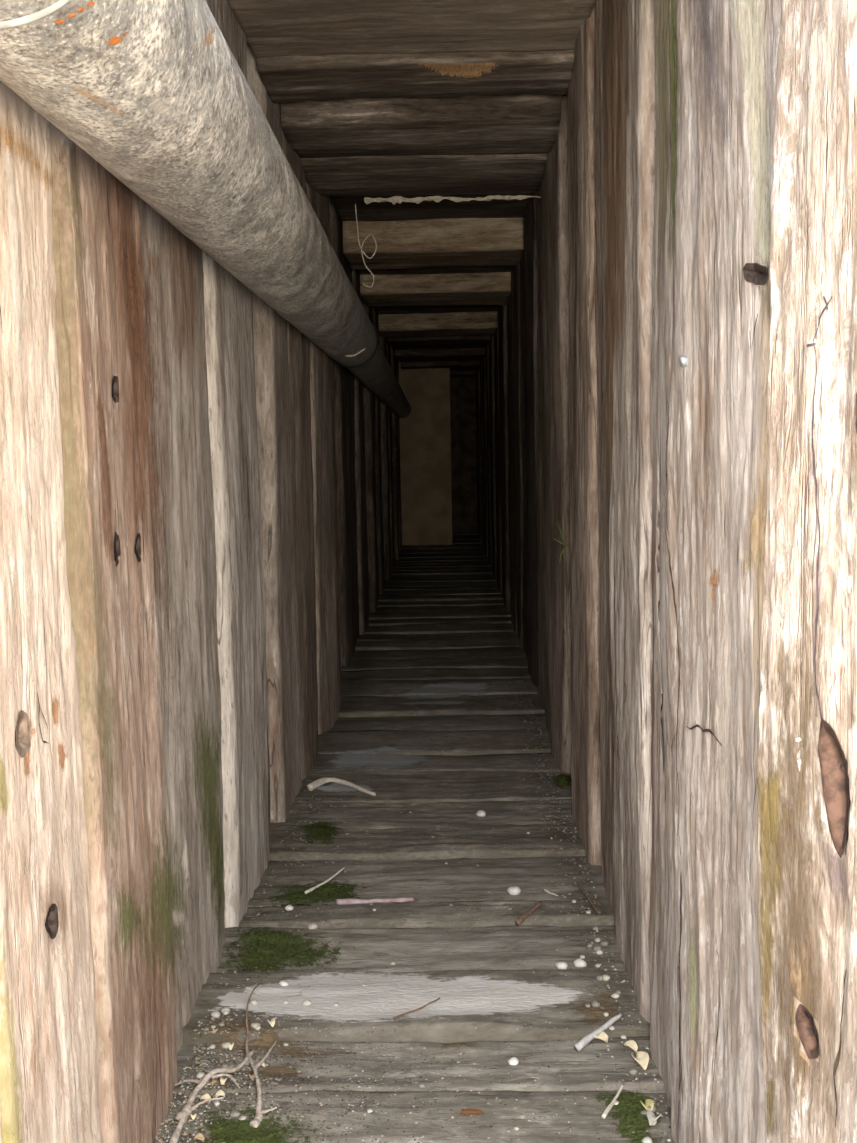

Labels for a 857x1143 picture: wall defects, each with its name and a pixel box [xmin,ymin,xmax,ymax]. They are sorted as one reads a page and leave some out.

leakage [0,129,53,186]
rust [54,1,95,24]
crack [804,296,832,722]
crack [658,510,721,1143]